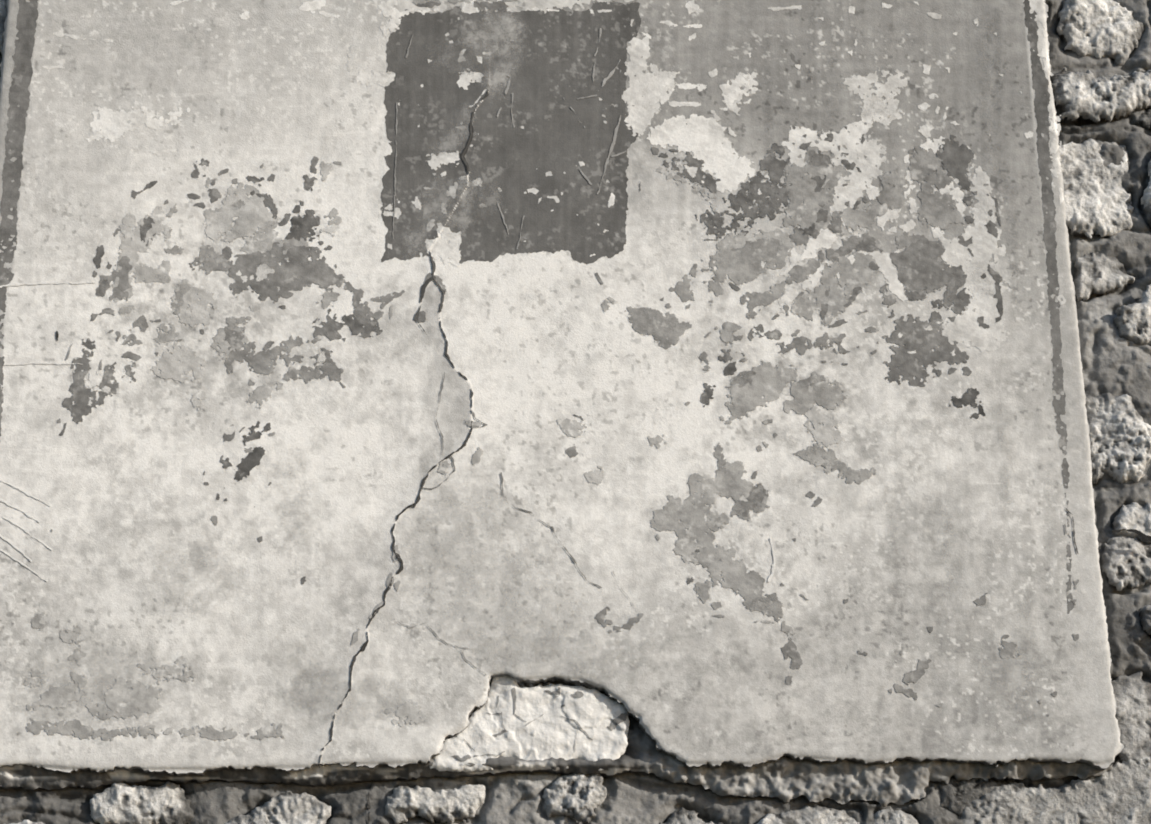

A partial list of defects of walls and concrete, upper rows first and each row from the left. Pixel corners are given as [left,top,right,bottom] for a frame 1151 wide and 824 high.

peeling [445,33,491,107]
peeling [377,0,633,37]
peeling [1029,0,1053,76]
peeling [382,144,482,267]
crack [460,91,489,174]
peeling [601,19,1020,484]
peeling [1049,109,1064,204]
peeling [57,156,405,501]
crack [319,252,634,768]
peeling [650,443,803,685]
peeling [17,625,284,741]
flaking render [430,676,630,772]